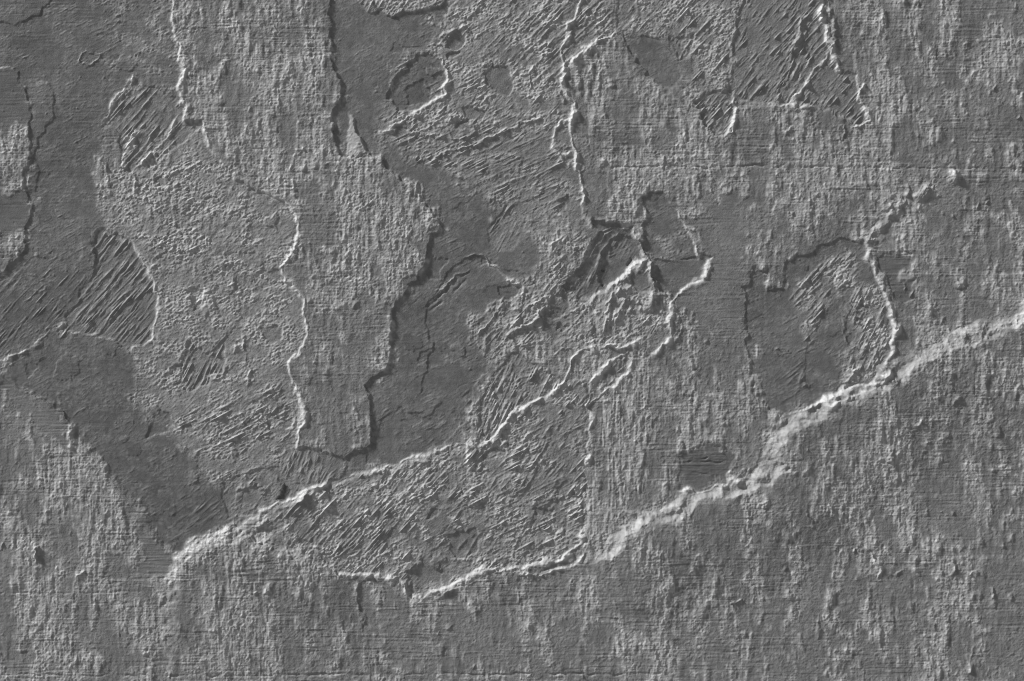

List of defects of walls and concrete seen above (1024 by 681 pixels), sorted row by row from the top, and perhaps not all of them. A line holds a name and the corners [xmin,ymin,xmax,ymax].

peeling [0,0,745,628]
peeling [742,238,917,415]
spalling [1010,313,1024,334]